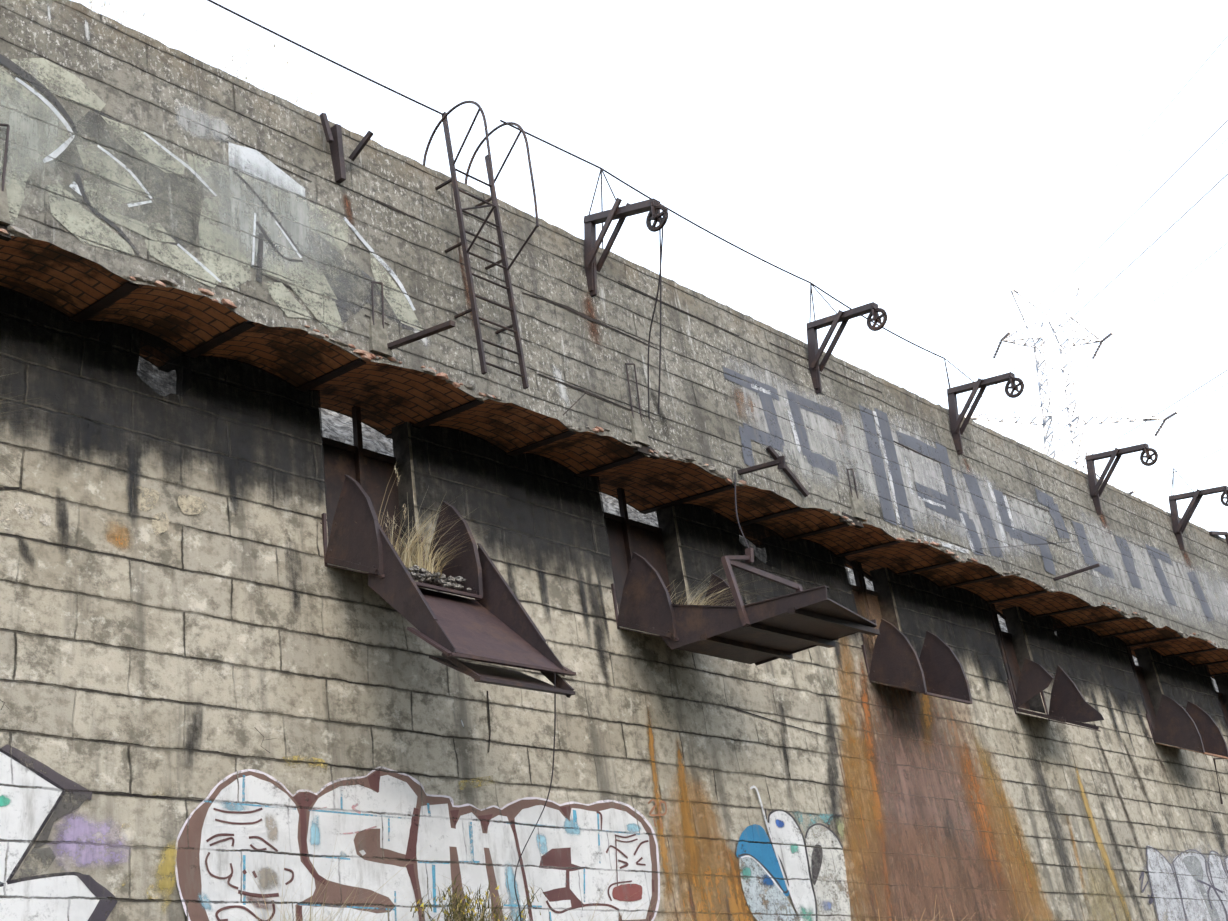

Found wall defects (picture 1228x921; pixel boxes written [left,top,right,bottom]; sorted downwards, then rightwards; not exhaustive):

water stain [57,500,68,548]
water stain [186,713,202,760]
corrosion [648,723,778,921]
corrosion [823,639,1049,921]